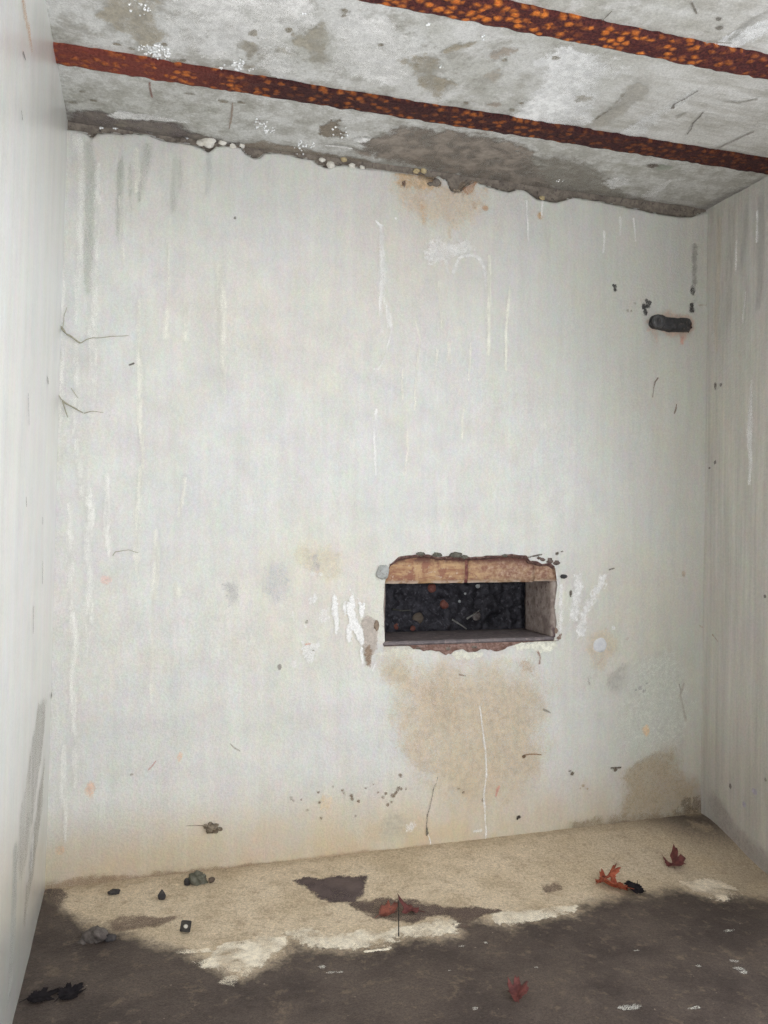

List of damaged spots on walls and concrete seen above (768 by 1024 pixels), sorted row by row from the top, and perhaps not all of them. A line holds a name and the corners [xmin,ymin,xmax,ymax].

damp [397,42,477,100]
damp [58,91,648,842]
spalling [389,552,560,569]
peeling [290,572,607,671]
damp [40,641,562,915]
damp [569,643,768,873]
damp [110,915,184,931]